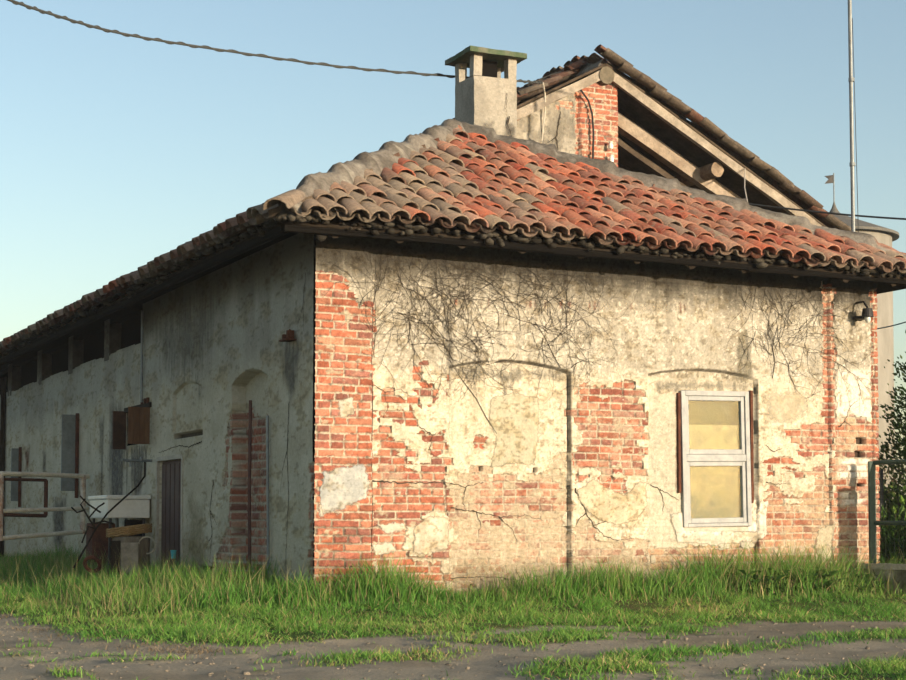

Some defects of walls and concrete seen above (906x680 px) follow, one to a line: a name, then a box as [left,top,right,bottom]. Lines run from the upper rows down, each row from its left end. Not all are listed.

flaking render [558,82,618,167]
flaking render [307,269,880,597]